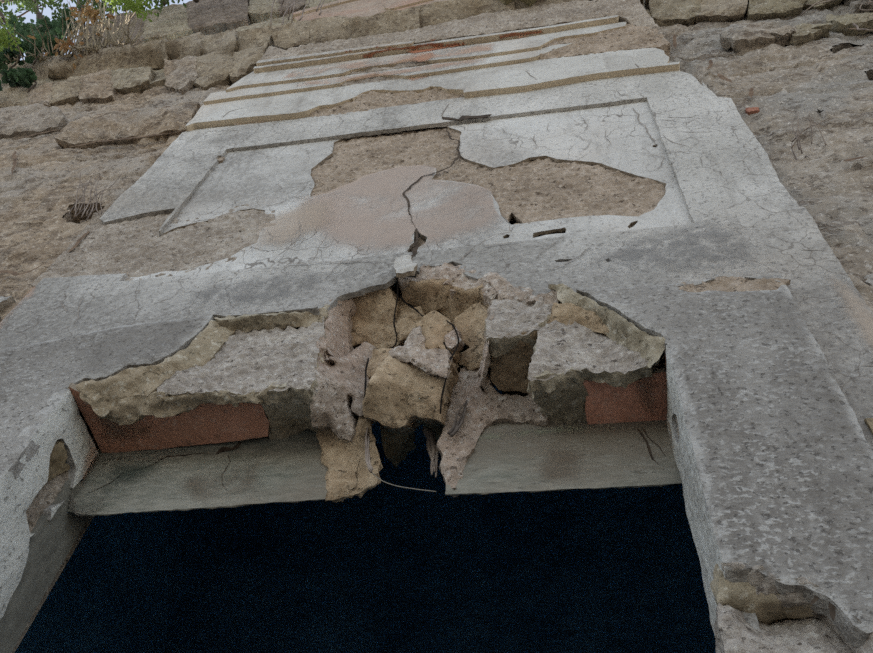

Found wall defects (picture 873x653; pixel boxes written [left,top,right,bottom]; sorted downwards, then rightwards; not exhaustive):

spalling [311,127,665,227]
crack [616,90,686,171]
crack [267,105,549,397]
peeling [679,276,791,293]
spalling [67,262,666,502]
crack [440,320,459,414]
spalling [26,440,70,533]
spalling [710,561,873,653]